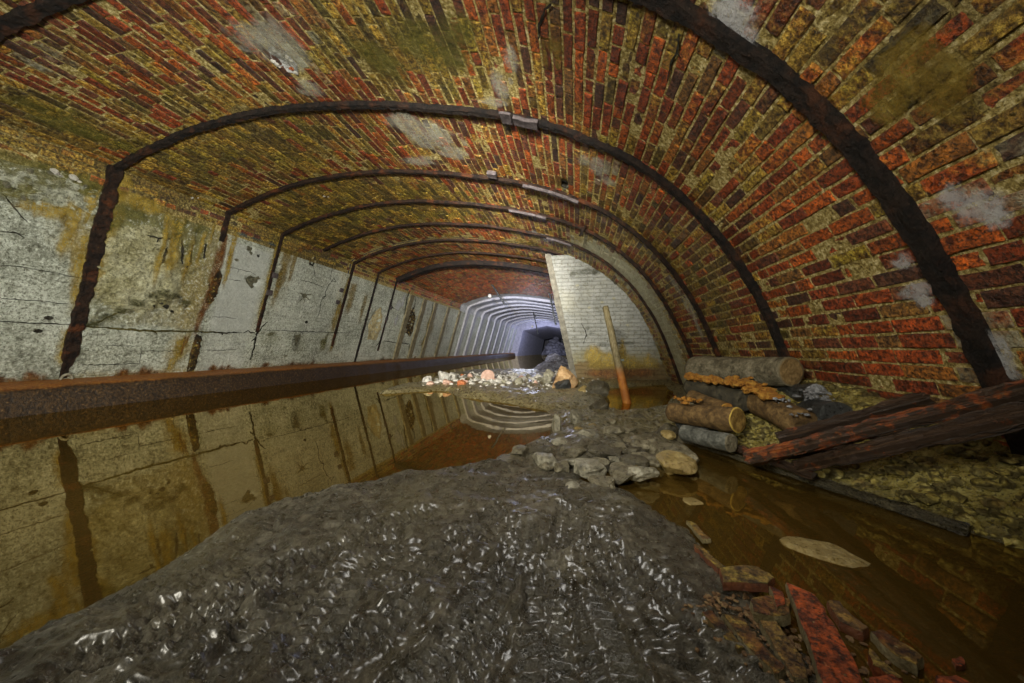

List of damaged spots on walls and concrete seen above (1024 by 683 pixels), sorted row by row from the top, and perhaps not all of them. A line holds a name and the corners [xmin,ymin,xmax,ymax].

efflorescence [714,0,752,42]
rust [106,175,132,238]
damp [119,190,215,279]
crack [0,265,345,365]